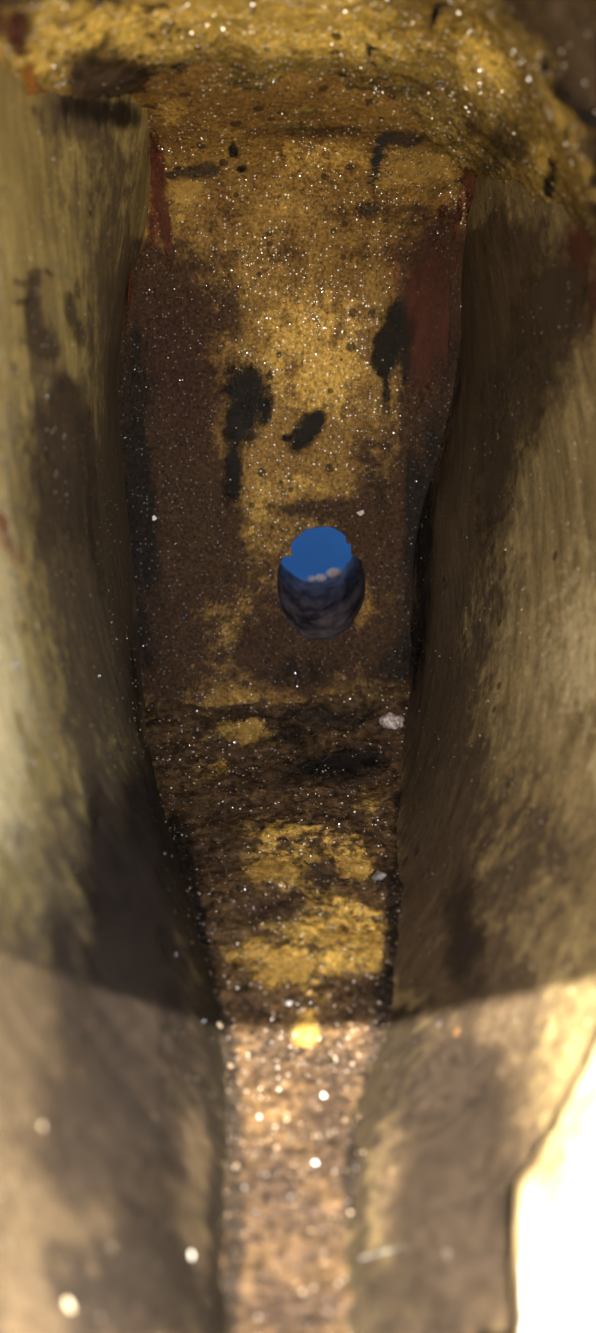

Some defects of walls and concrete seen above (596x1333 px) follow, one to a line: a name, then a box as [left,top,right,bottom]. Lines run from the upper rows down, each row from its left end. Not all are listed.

leakage [370,298,418,407]
leakage [221,359,273,502]
leakage [282,410,326,453]